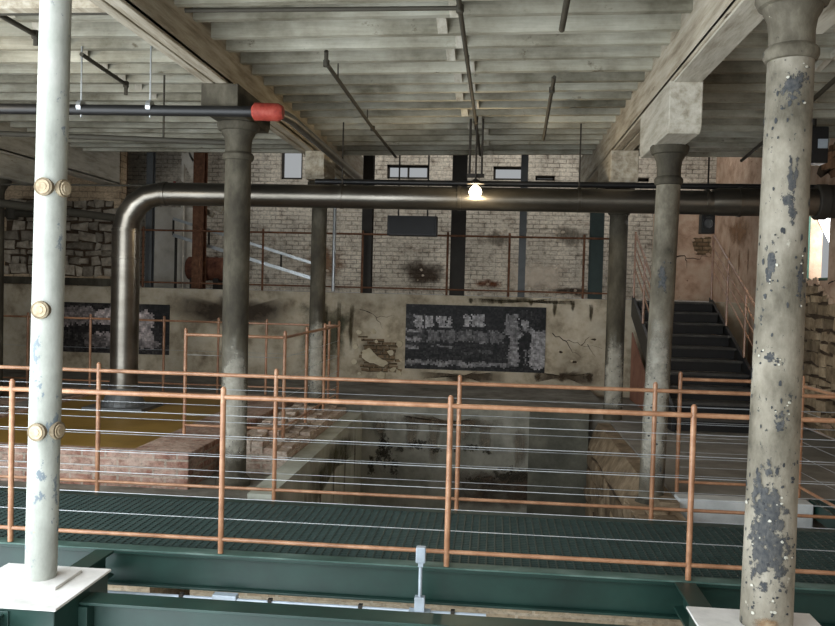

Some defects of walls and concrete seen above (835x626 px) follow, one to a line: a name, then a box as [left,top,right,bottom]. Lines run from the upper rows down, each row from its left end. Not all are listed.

peeling [762,149,804,300]
peeling [763,63,810,139]
spalling [817,142,835,178]
peeling [351,329,403,379]
spalling [771,234,835,439]
peeling [745,459,798,617]